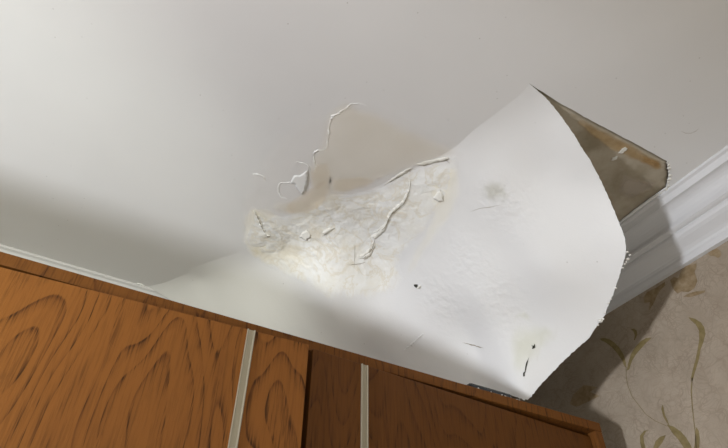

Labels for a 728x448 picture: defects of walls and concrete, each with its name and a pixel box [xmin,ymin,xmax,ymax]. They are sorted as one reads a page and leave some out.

peeling [533,86,672,221]
flaking render [243,154,460,304]